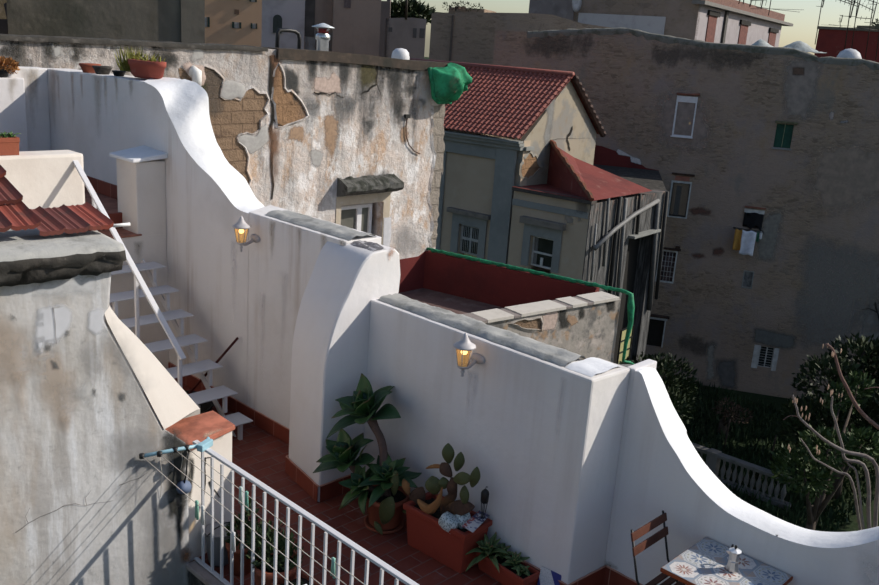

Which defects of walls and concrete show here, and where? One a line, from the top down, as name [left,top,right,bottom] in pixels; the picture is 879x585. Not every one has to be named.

water stain [285,68,299,99]
water stain [308,61,350,84]
crack [314,66,381,98]
water stain [380,66,425,117]
flaking render [179,62,310,186]
crack [269,55,283,200]
water stain [324,97,356,153]
crack [554,126,580,151]
flaking render [519,151,543,181]
crack [15,470,150,533]
water stain [164,429,204,585]